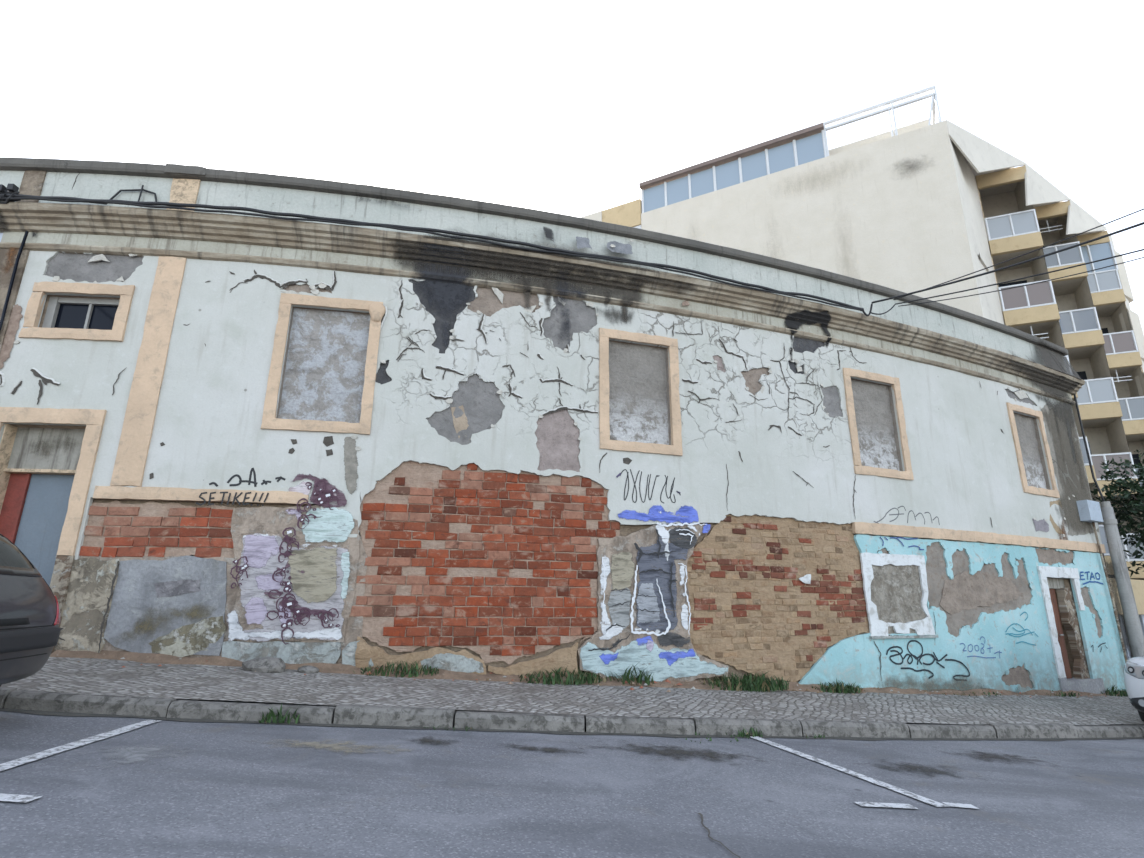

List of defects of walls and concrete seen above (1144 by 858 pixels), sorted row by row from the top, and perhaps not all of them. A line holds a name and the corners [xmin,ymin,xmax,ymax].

spalling [45,253,143,284]
crack [206,270,337,291]
spalling [426,374,505,445]
crack [380,279,598,416]
spalling [408,280,599,354]
leakage [395,227,694,322]
crack [672,321,866,448]
leakage [1009,340,1093,533]
spalling [79,500,235,558]
spalling [343,409,620,665]
spalling [687,514,869,682]
spalling [925,542,1034,637]